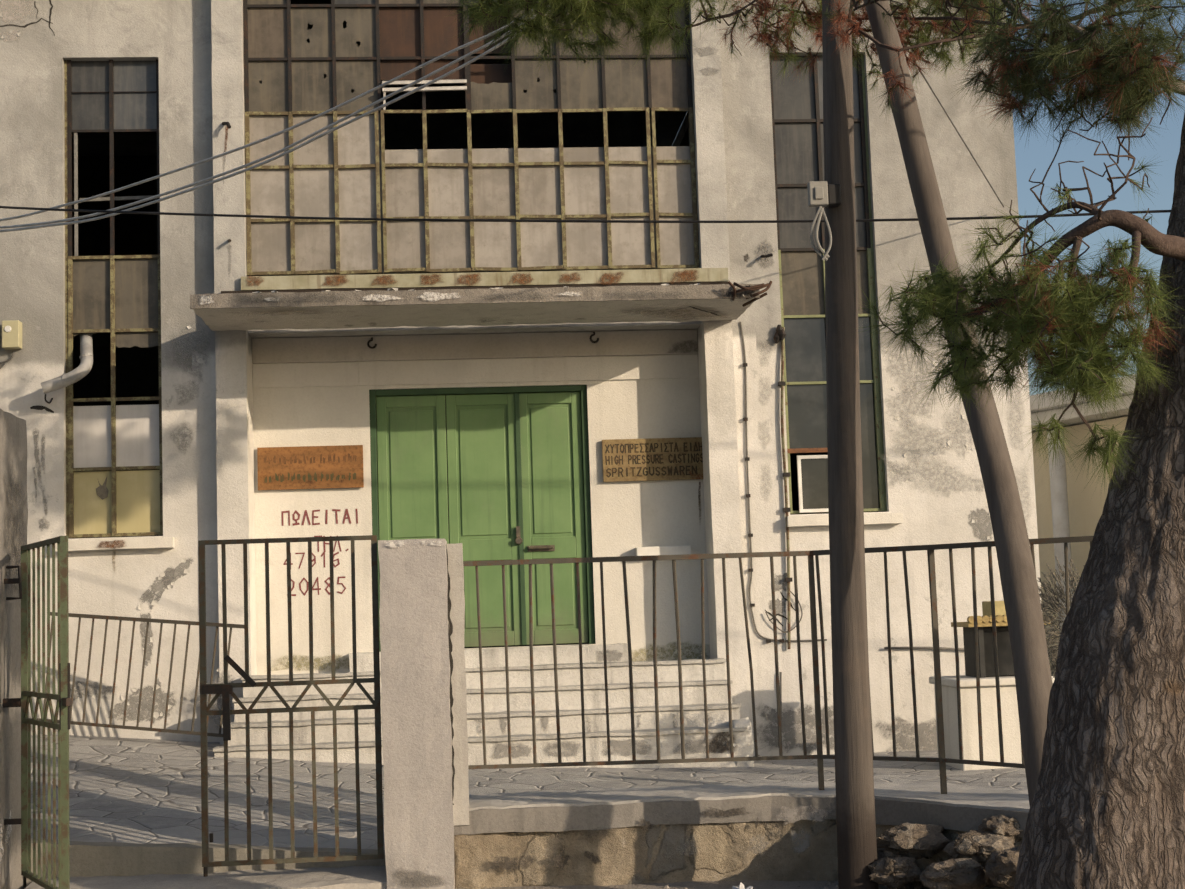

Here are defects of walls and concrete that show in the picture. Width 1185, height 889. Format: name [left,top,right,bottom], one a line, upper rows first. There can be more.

crack [0,0,55,36]
flaking render [138,558,193,668]
flaking render [70,679,176,724]